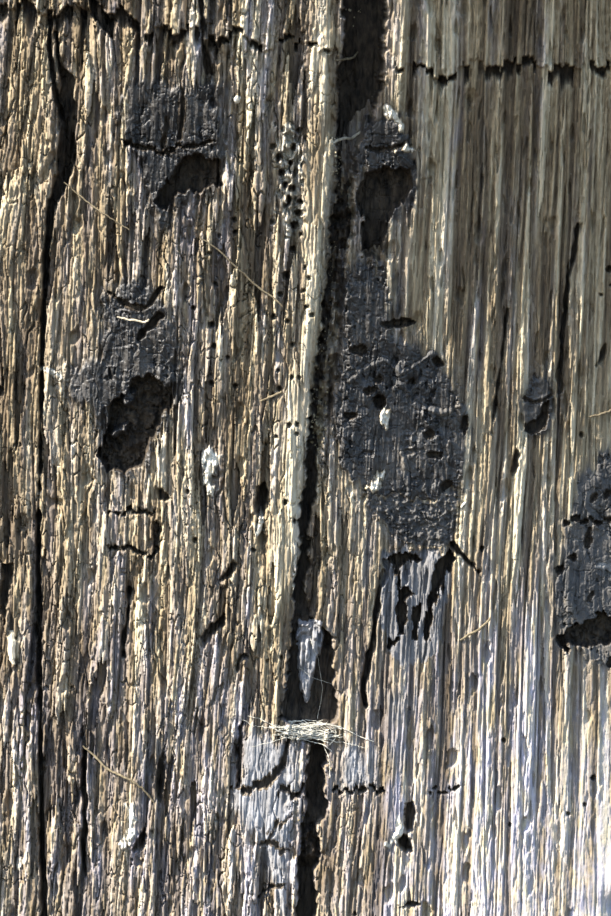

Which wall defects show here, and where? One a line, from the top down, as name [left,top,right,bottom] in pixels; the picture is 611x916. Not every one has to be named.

spalling [380,317,416,330]
spalling [349,343,370,358]
peeling [122,387,136,407]
peeling [363,374,393,431]
peeling [108,421,129,439]
spalling [459,415,469,436]
spalling [423,429,442,459]
crack [0,0,263,916]
crack [229,0,611,916]
spalling [590,489,611,503]
spalling [554,527,593,575]